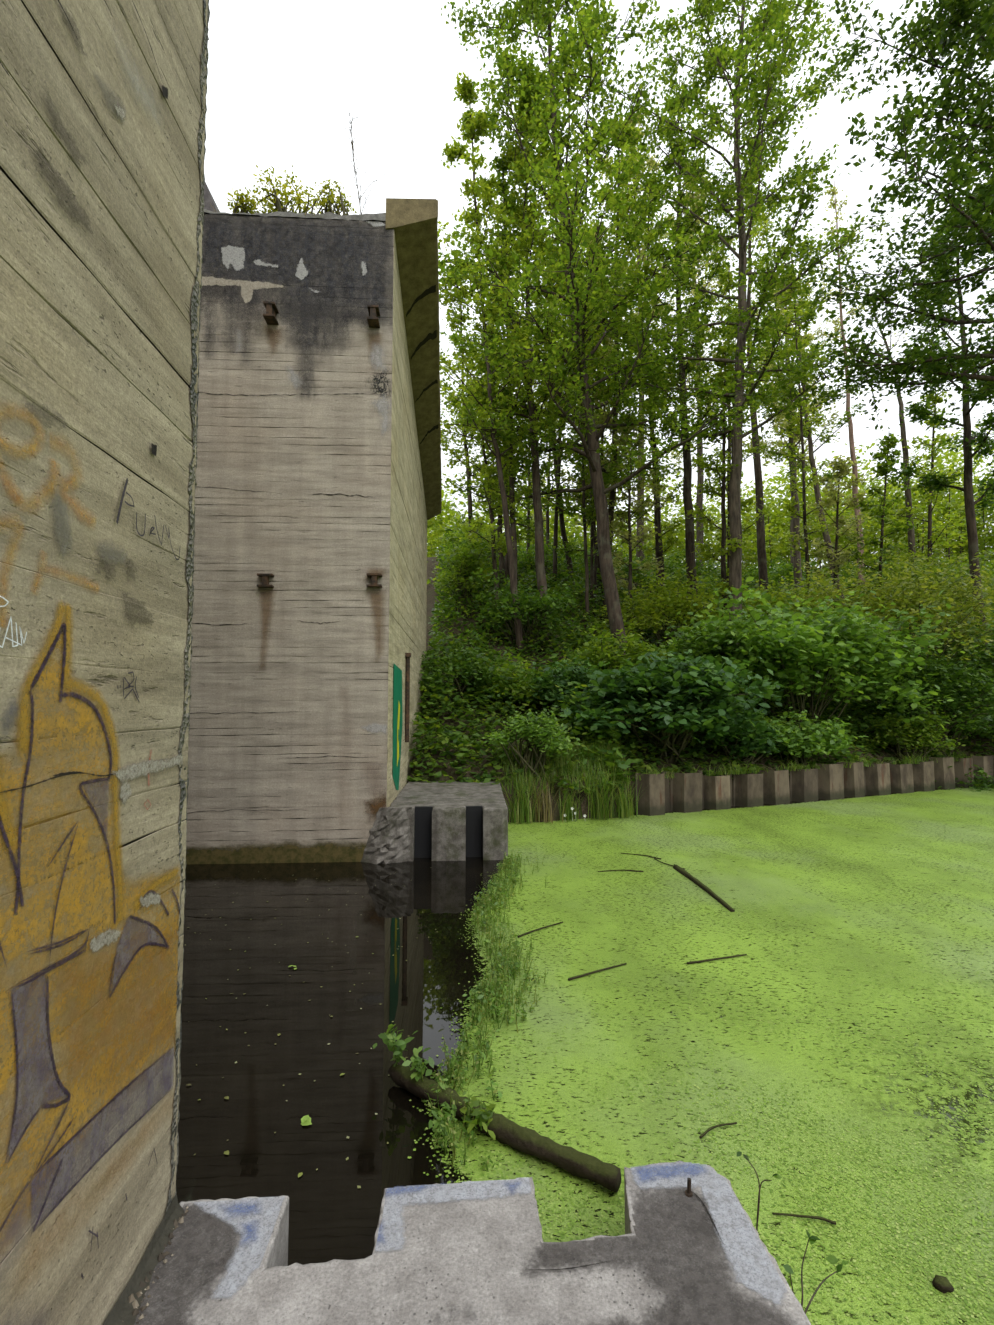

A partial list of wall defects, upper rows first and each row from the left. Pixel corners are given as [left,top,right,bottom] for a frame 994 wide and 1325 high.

spalling [221,245,278,271]
spalling [296,258,318,293]
damp [201,214,394,393]